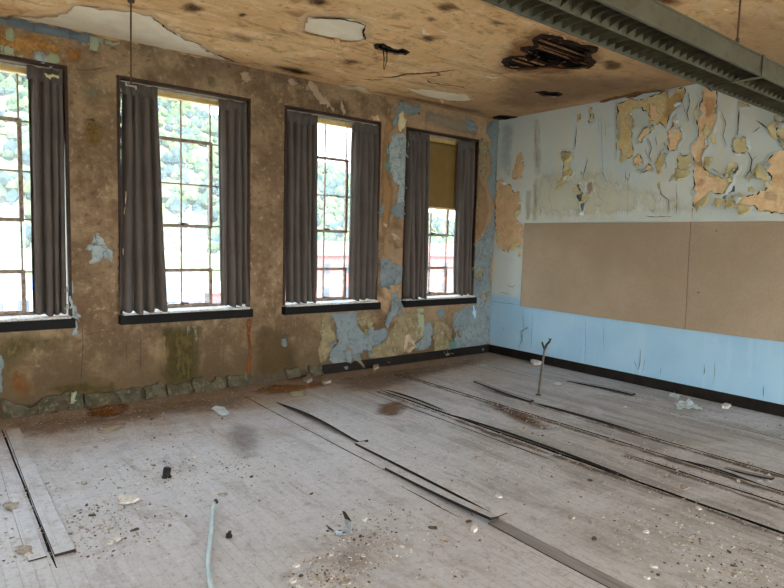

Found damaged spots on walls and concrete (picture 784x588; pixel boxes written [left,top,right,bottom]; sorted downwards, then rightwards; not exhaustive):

peeling [0,17,120,58]
spalling [507,38,590,68]
crack [366,70,466,89]
peeling [614,85,784,217]
peeling [86,233,113,264]
peeling [318,101,526,370]
water stain [163,326,198,383]